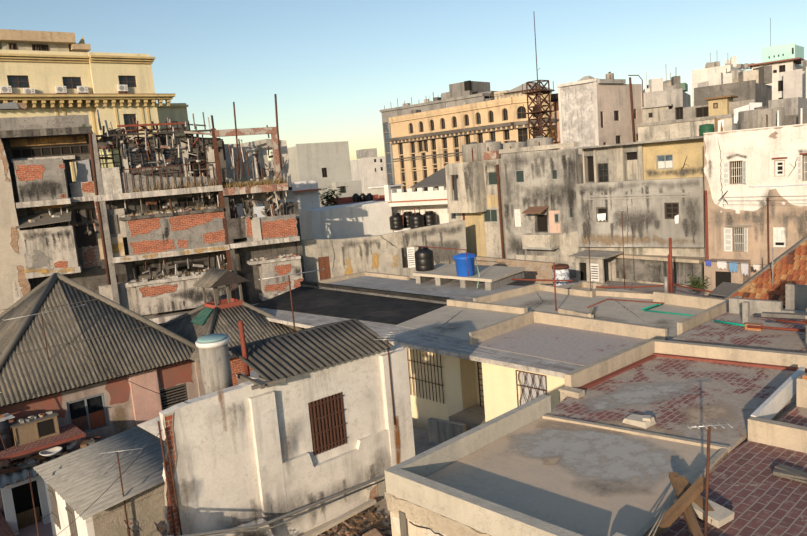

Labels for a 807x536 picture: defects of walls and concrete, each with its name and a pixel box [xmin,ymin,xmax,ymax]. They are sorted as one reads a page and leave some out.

flaking render [0,138,46,182]
peeling [704,125,807,214]
flaking render [9,227,19,254]
flaking render [11,250,68,303]
damp [342,241,380,275]
damp [403,227,460,264]
damp [569,190,665,245]
damp [682,191,698,241]
flaking render [154,412,182,536]
damp [235,504,302,534]